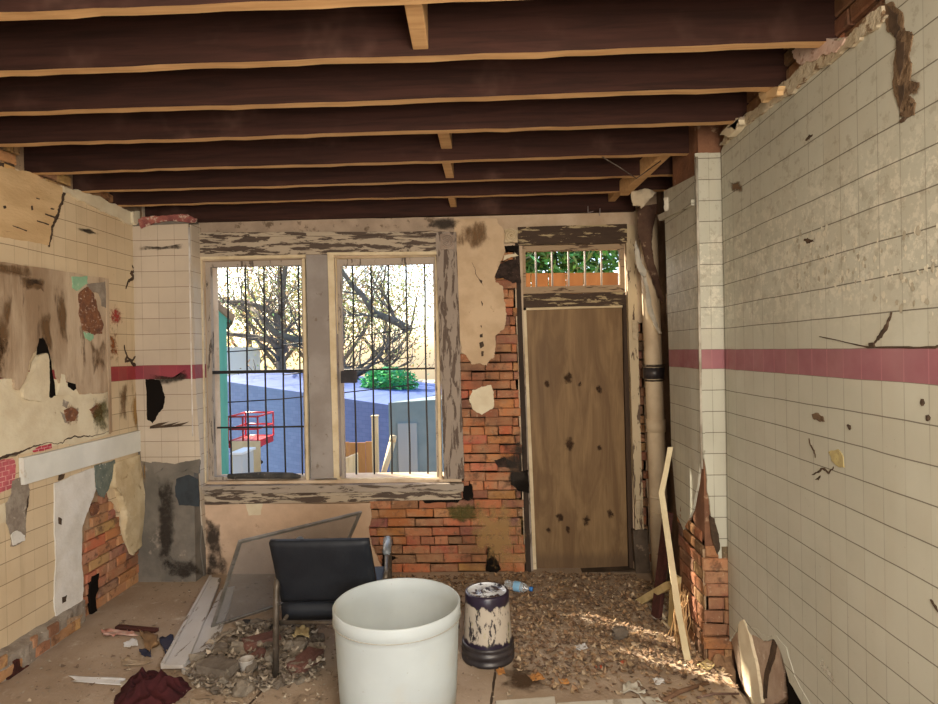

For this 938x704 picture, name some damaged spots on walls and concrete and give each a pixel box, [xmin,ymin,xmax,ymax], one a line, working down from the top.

spalling [720,0,889,147]
crack [48,186,66,247]
peeling [71,276,106,308]
crack [819,312,938,349]
flaking render [0,378,109,457]
flaking render [366,278,526,572]
spalling [152,459,201,474]
leakage [158,485,201,578]
flaking render [0,493,139,683]